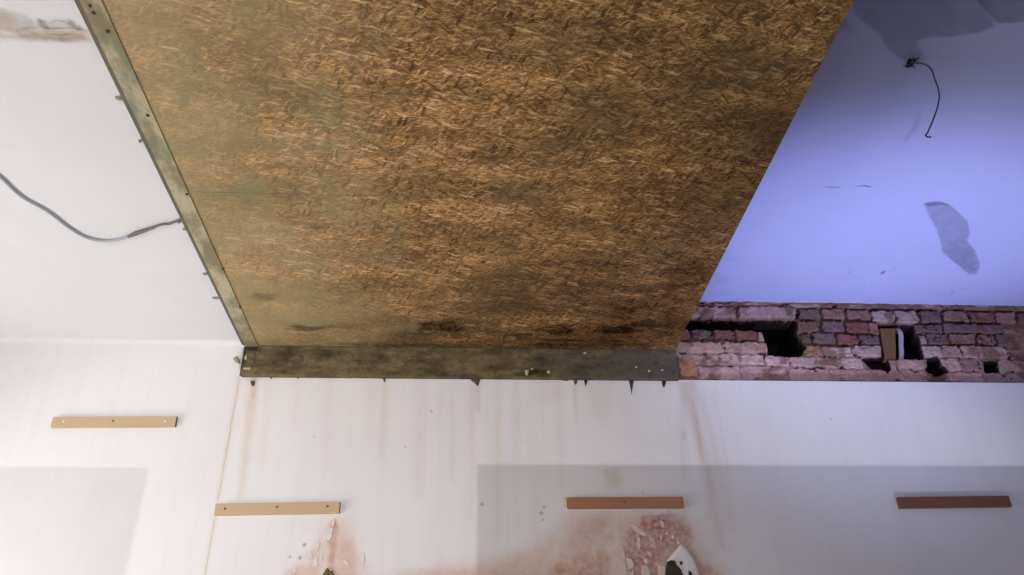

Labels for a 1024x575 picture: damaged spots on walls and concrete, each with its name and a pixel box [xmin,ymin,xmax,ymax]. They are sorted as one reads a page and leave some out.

flaking render [675,301,1024,383]
peeling [292,518,335,575]
peeling [610,520,699,575]